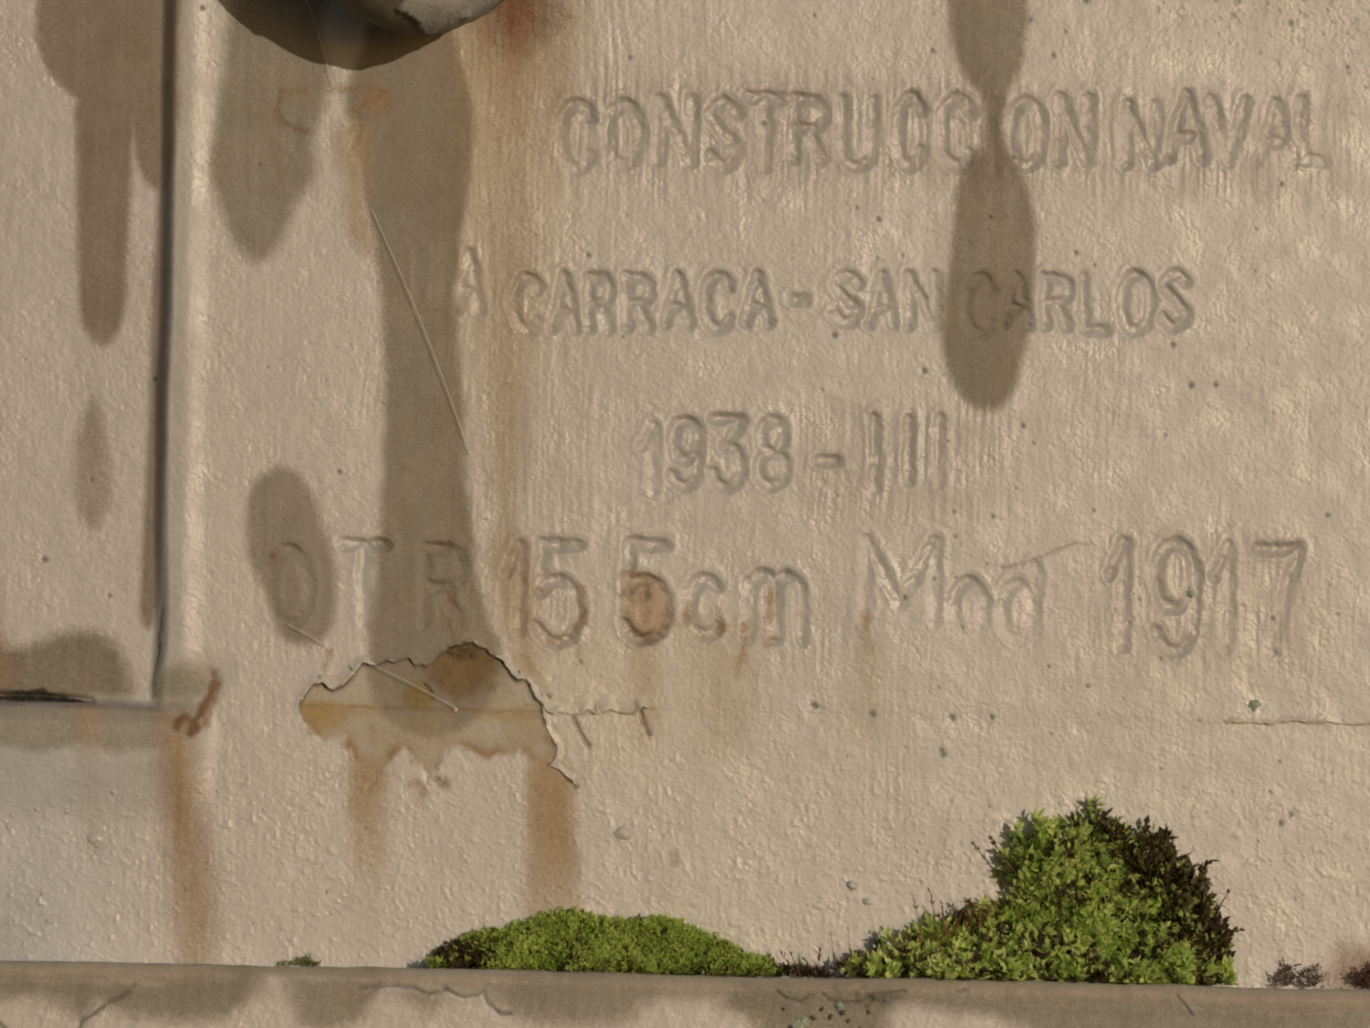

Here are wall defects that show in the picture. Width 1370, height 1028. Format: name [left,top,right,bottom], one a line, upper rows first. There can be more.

water stain [937,0,1040,416]
water stain [31,0,185,632]
water stain [204,0,508,745]
water stain [0,622,223,757]
peeling [296,638,650,807]
corrosion [617,566,694,753]
crack [1222,711,1370,727]